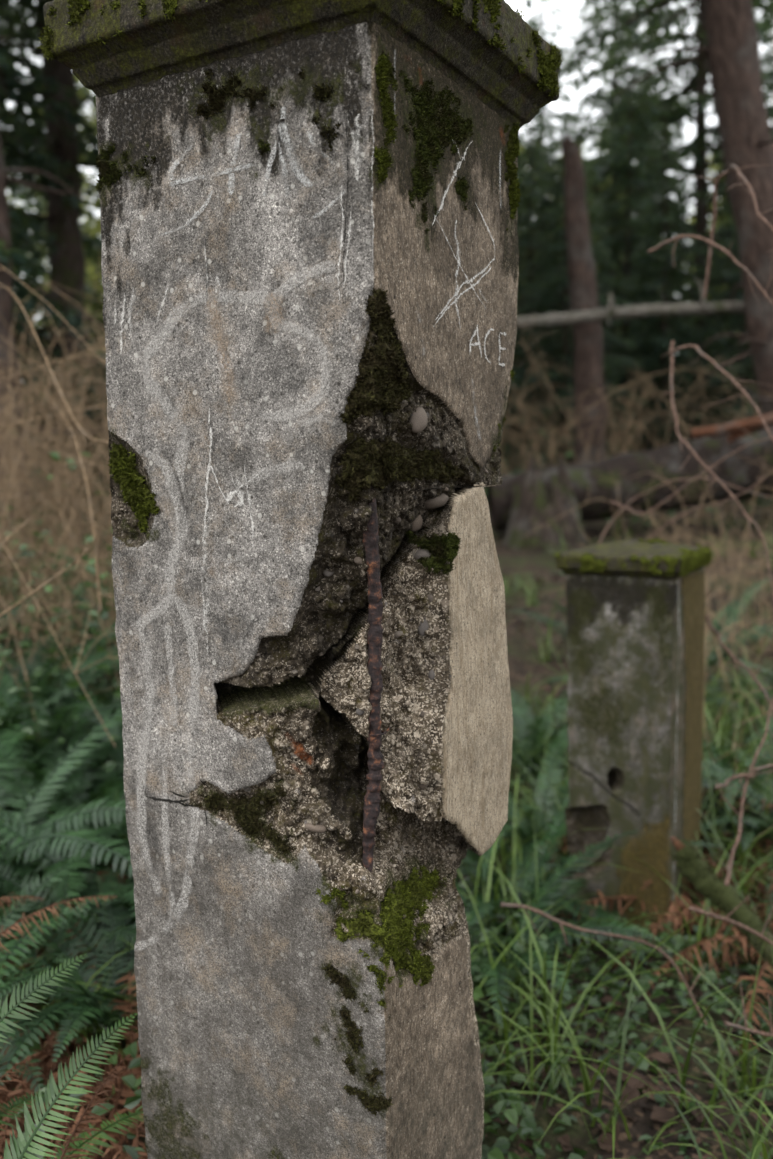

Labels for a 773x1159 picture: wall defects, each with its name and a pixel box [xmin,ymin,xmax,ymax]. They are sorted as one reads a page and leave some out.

water stain [96,20,519,291]
spalling [214,320,503,688]